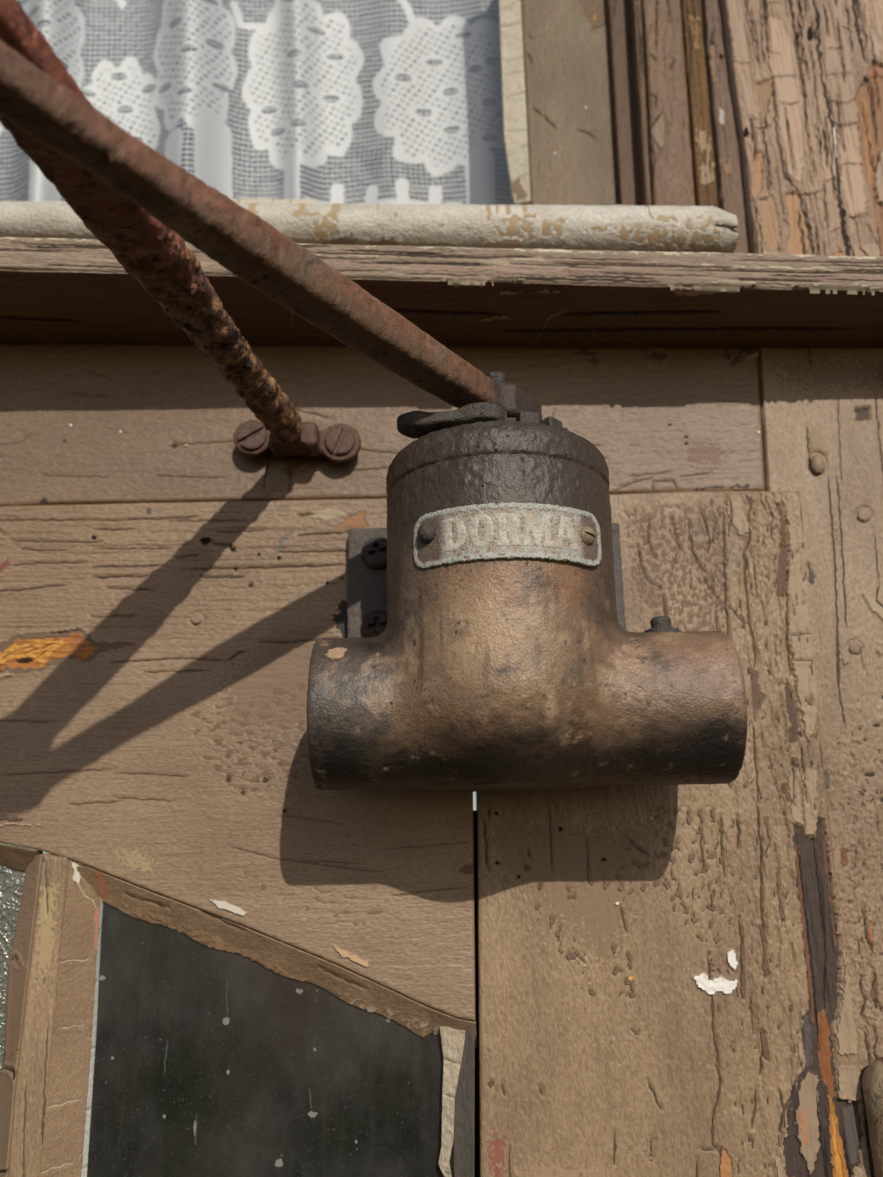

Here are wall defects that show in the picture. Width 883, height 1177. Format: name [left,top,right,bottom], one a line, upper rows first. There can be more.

peeling [686,14,719,81]
peeling [695,128,731,185]
peeling [289,203,341,240]
peeling [486,205,565,239]
peeling [591,206,726,253]
crack [395,310,861,366]
crack [613,472,804,666]
crack [786,387,883,725]
peeling [591,491,883,1177]
crack [696,954,722,1177]